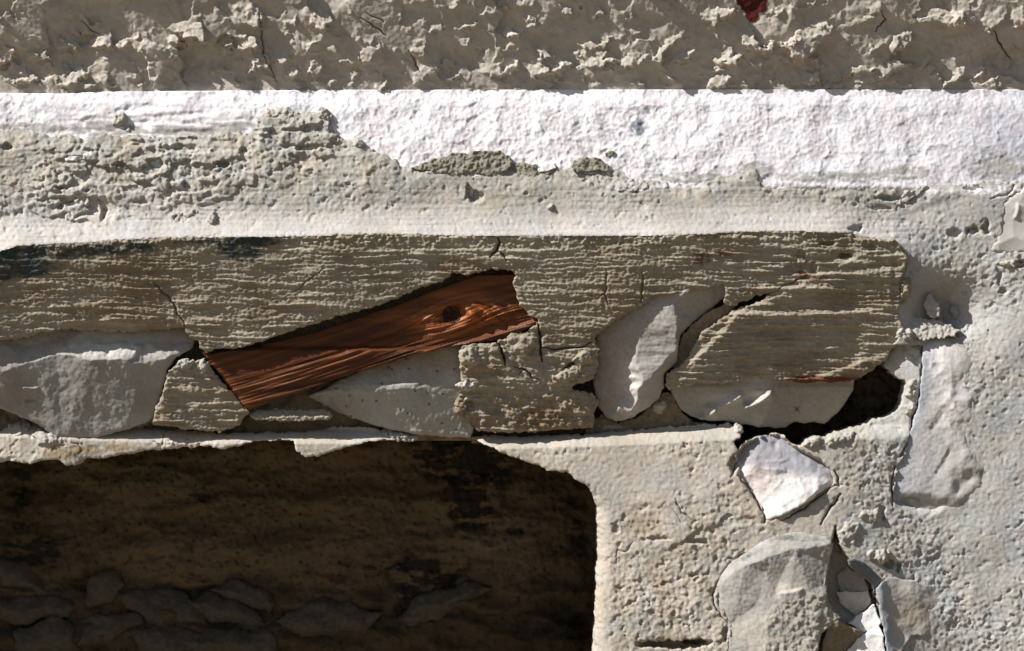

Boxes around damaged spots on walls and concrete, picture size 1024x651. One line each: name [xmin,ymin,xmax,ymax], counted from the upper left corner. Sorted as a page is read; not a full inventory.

corrosion [736,0,767,22]
spalling [411,150,551,178]
spalling [571,151,615,174]
spalling [167,269,514,390]
crack [499,324,589,379]
spalling [678,294,767,347]
spalling [0,409,31,431]
spalling [215,374,402,441]
spalling [416,427,586,443]
spalling [572,379,604,418]
spalling [661,365,901,446]
crack [891,351,923,506]